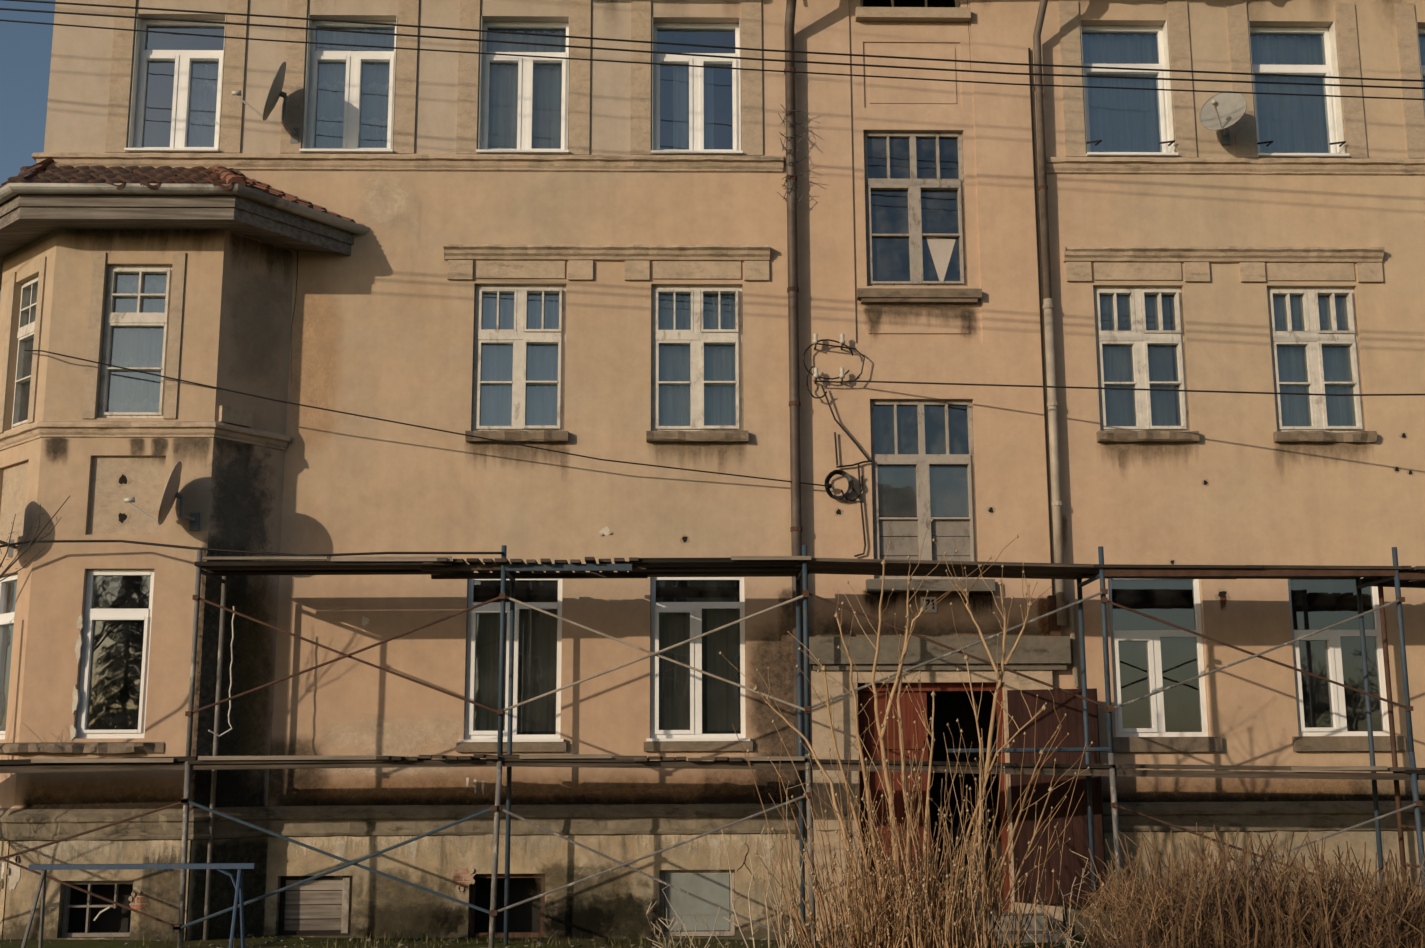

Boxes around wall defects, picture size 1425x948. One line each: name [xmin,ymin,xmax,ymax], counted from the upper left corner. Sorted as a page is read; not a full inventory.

leakage [24,438,788,811]
leakage [1102,780,1425,802]